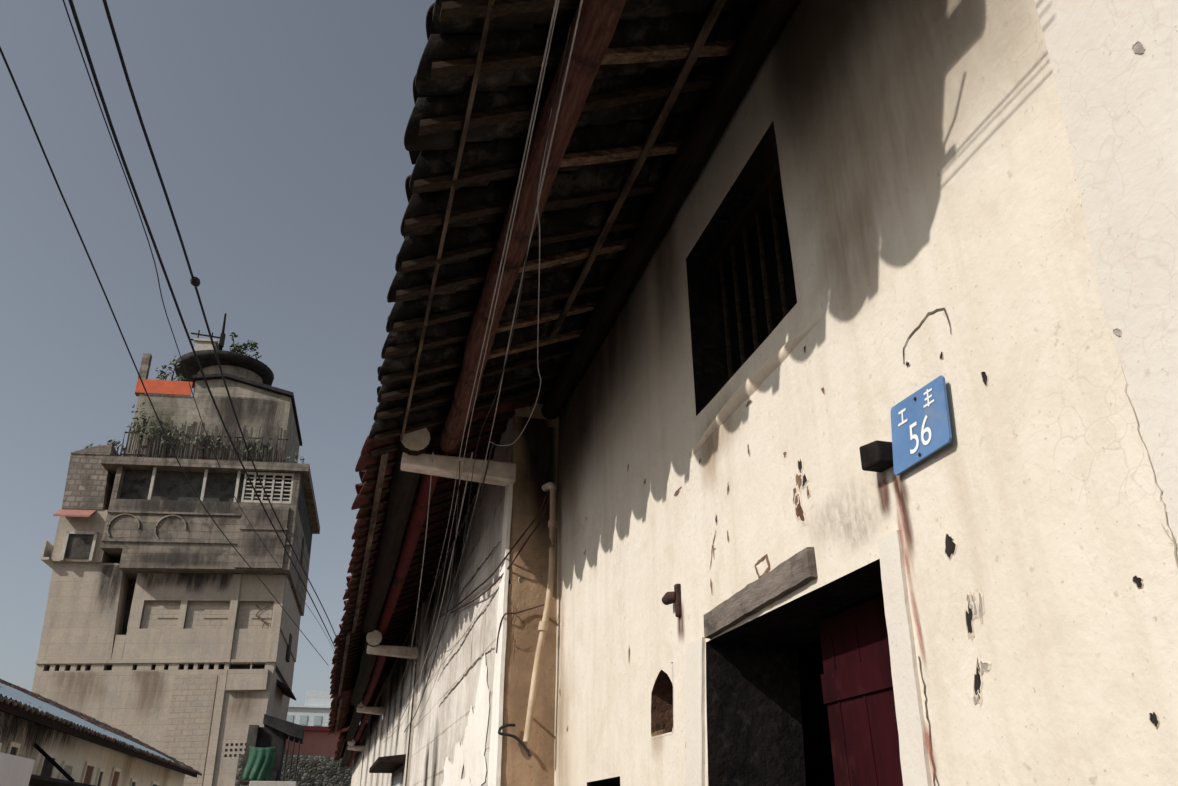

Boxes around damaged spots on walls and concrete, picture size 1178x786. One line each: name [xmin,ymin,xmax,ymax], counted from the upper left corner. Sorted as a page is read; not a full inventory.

crack [903,308,951,364]
spalling [783,451,811,526]
crack [1121,366,1178,569]
corrosion [877,475,911,571]
leakage [99,565,123,599]
leakage [145,553,228,589]
crack [255,604,271,628]